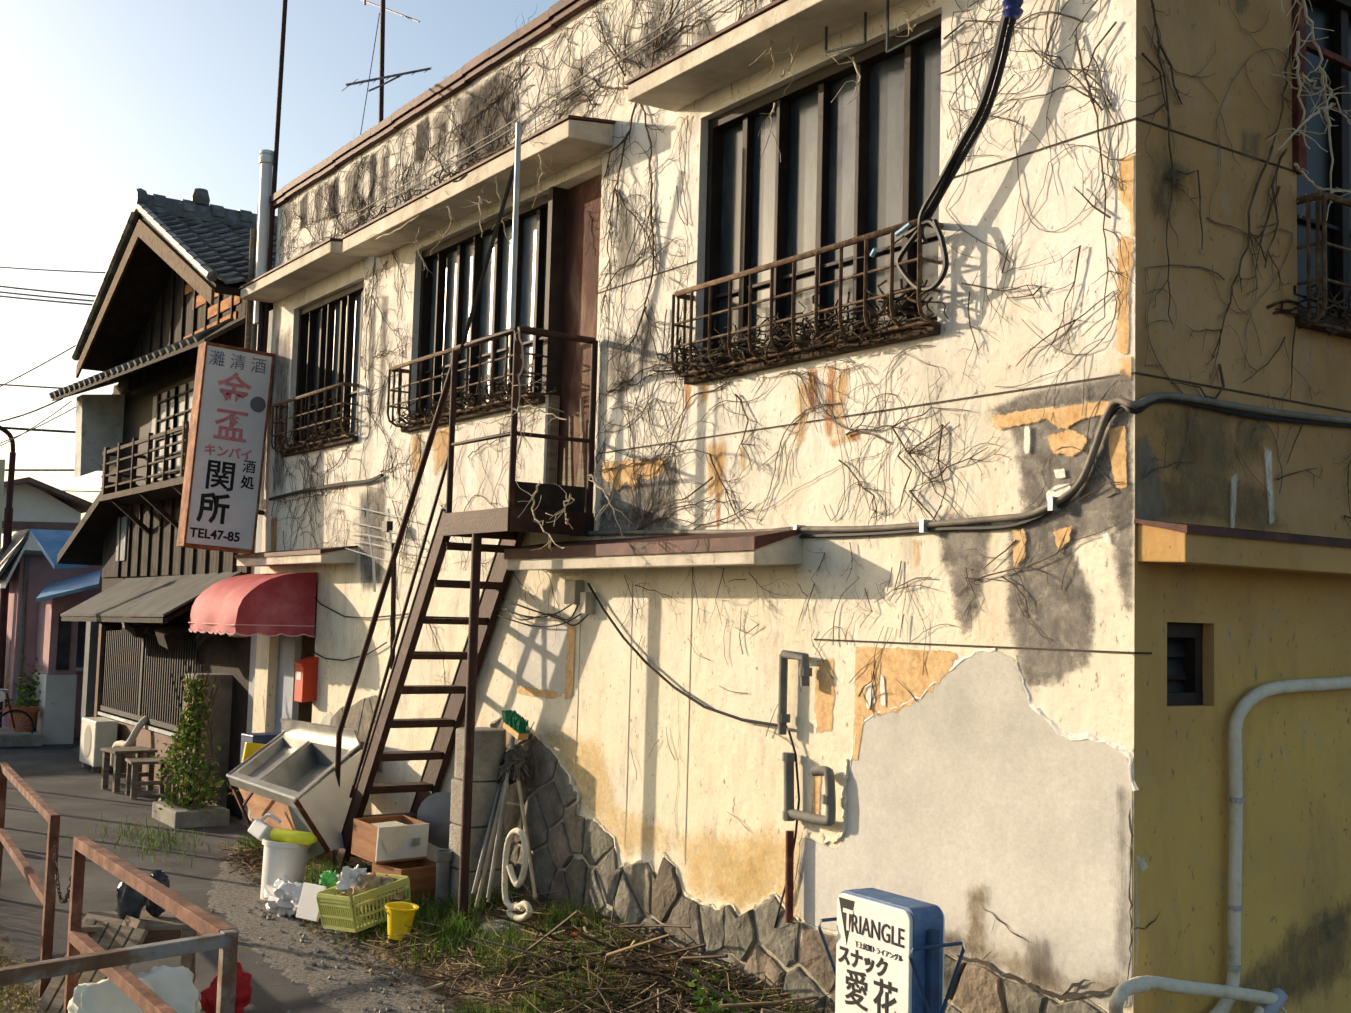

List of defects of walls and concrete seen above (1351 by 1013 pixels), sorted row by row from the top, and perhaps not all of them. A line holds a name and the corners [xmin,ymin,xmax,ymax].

peeling [1116,154,1134,379]
rust [797,368,860,445]
peeling [990,401,1127,501]
damp [939,513,991,632]
peeling [1012,529,1026,567]
peeling [1053,526,1072,549]
damp [992,373,1274,686]
damp [549,732,796,912]
flaking render [576,647,1148,1010]